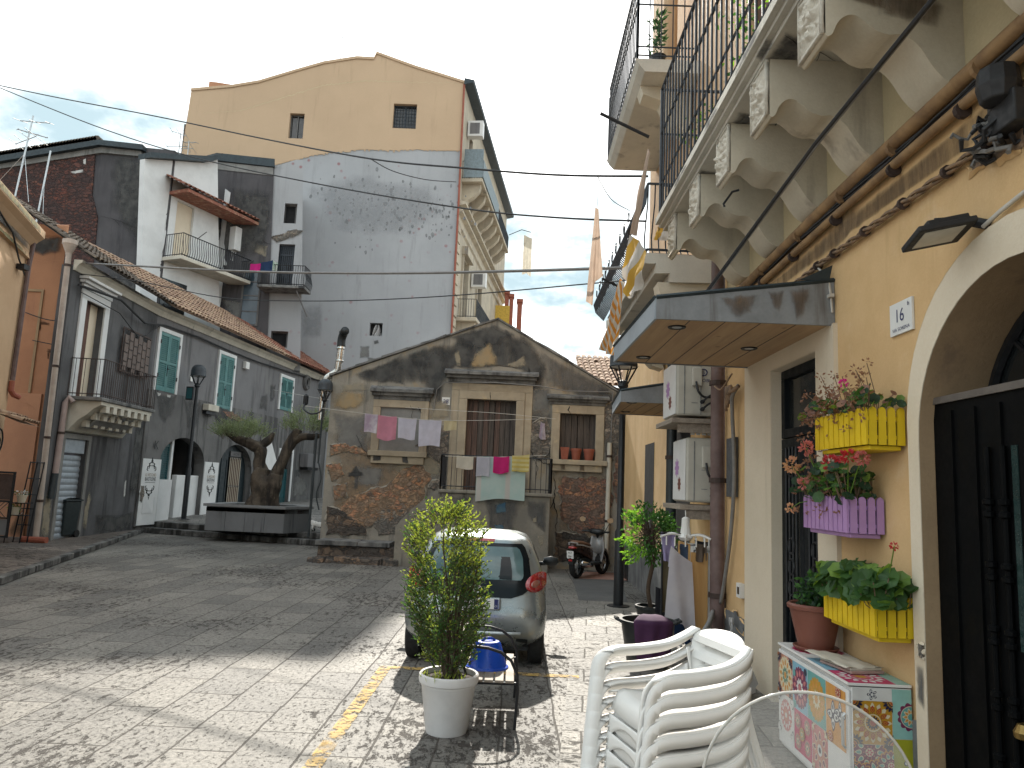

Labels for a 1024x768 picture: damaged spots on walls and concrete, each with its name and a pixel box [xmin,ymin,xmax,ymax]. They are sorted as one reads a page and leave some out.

damp [359,326,615,423]
flaking render [324,425,450,537]
flaking render [552,402,619,562]